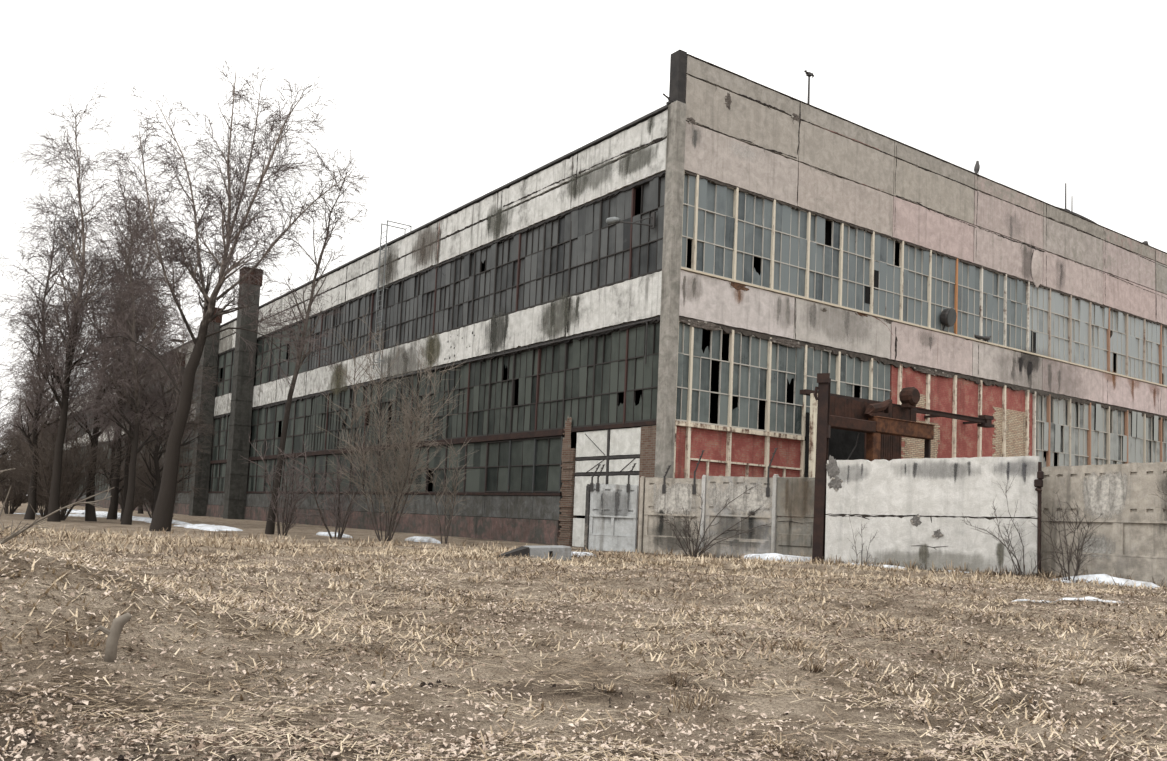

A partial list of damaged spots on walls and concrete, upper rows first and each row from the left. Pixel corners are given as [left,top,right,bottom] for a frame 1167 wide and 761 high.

damp [569,145,651,197]
damp [377,249,398,285]
damp [412,227,441,266]
damp [485,308,508,352]
damp [543,294,579,338]